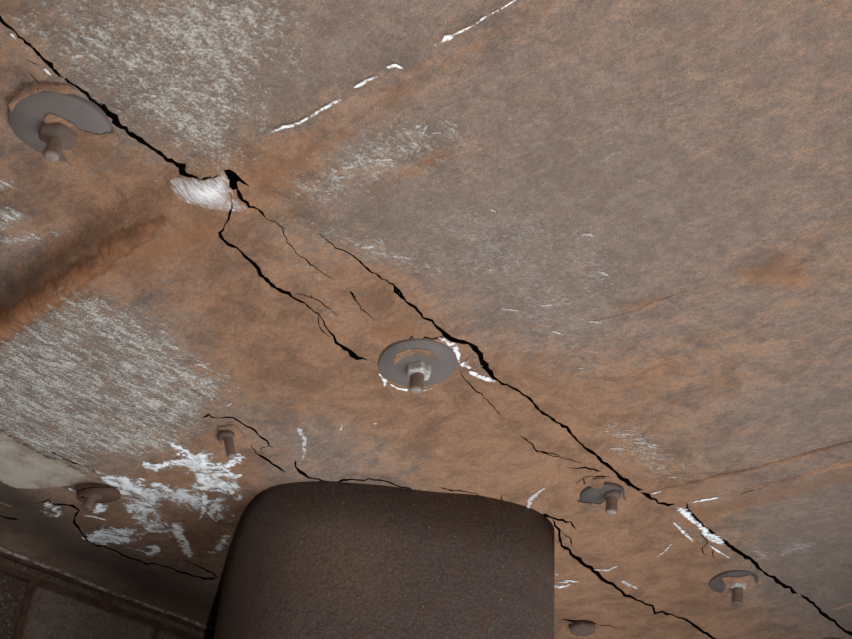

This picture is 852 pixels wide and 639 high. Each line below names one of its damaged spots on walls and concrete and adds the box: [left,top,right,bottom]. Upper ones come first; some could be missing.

efflorescence [434,0,516,45]
efflorescence [59,0,284,168]
efflorescence [261,99,341,132]
crack [0,16,367,360]
efflorescence [171,177,239,210]
spalling [224,169,250,190]
efflorescence [296,128,428,200]
crack [40,448,97,473]
leakage [0,291,244,558]
crack [202,413,410,488]
crack [318,233,852,639]
crack [40,499,218,580]